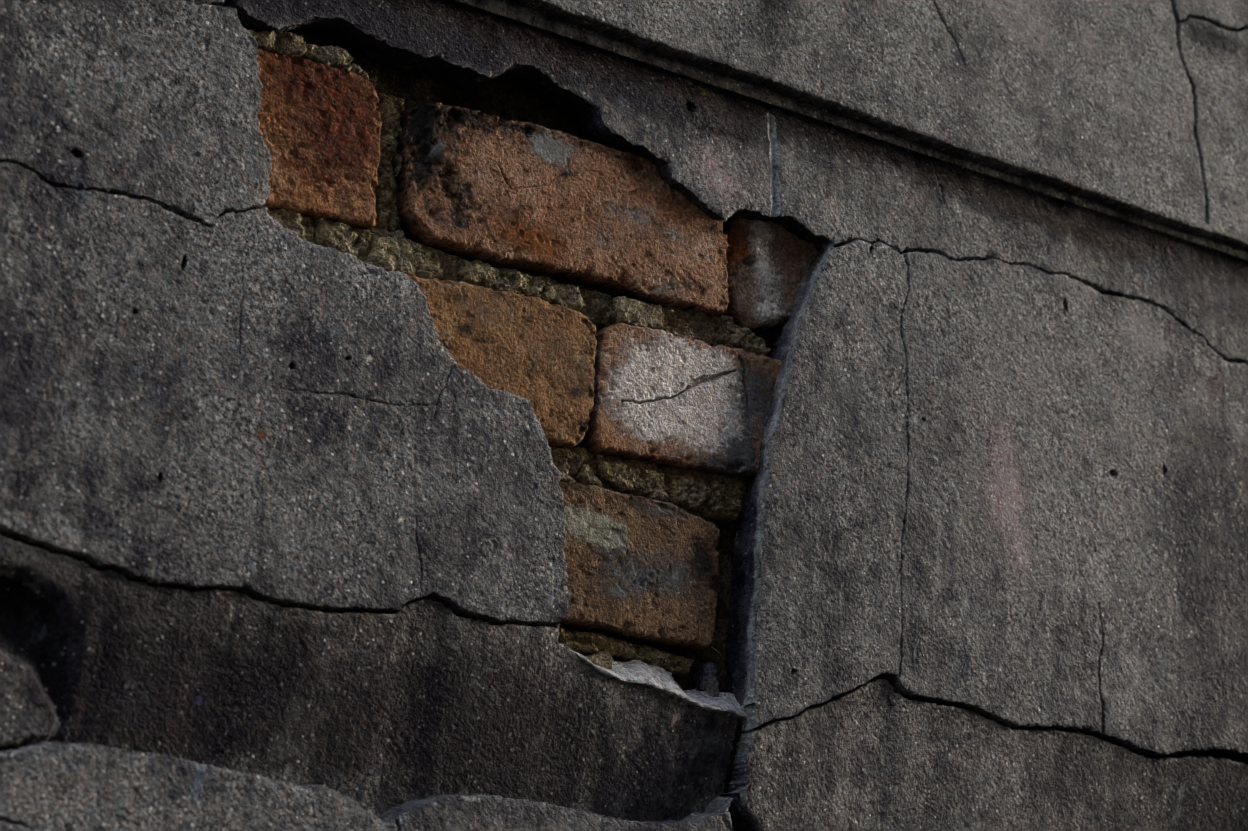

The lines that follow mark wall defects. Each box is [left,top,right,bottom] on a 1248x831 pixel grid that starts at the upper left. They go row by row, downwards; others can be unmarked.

flaking render [235,5,833,720]
crack [0,532,203,591]
crack [724,657,1248,785]
flaking render [718,782,765,831]